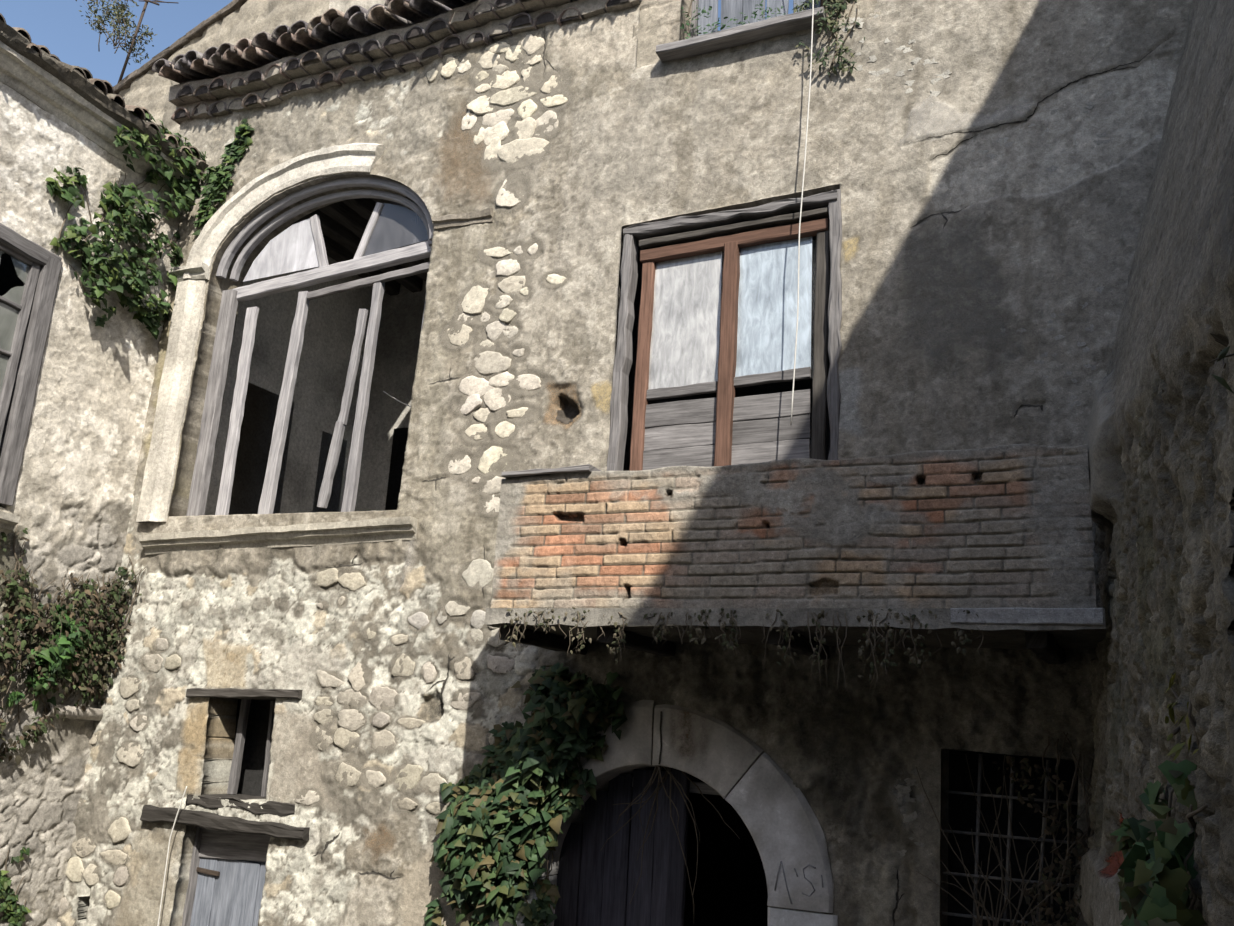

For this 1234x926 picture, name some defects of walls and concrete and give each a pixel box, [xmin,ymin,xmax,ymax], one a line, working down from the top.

flaking render [424,29,573,213]
crack [904,39,1168,159]
flaking render [440,237,581,518]
spalling [557,513,584,522]
flaking render [99,636,182,767]
flaking render [310,559,526,816]
flaking render [295,788,322,808]